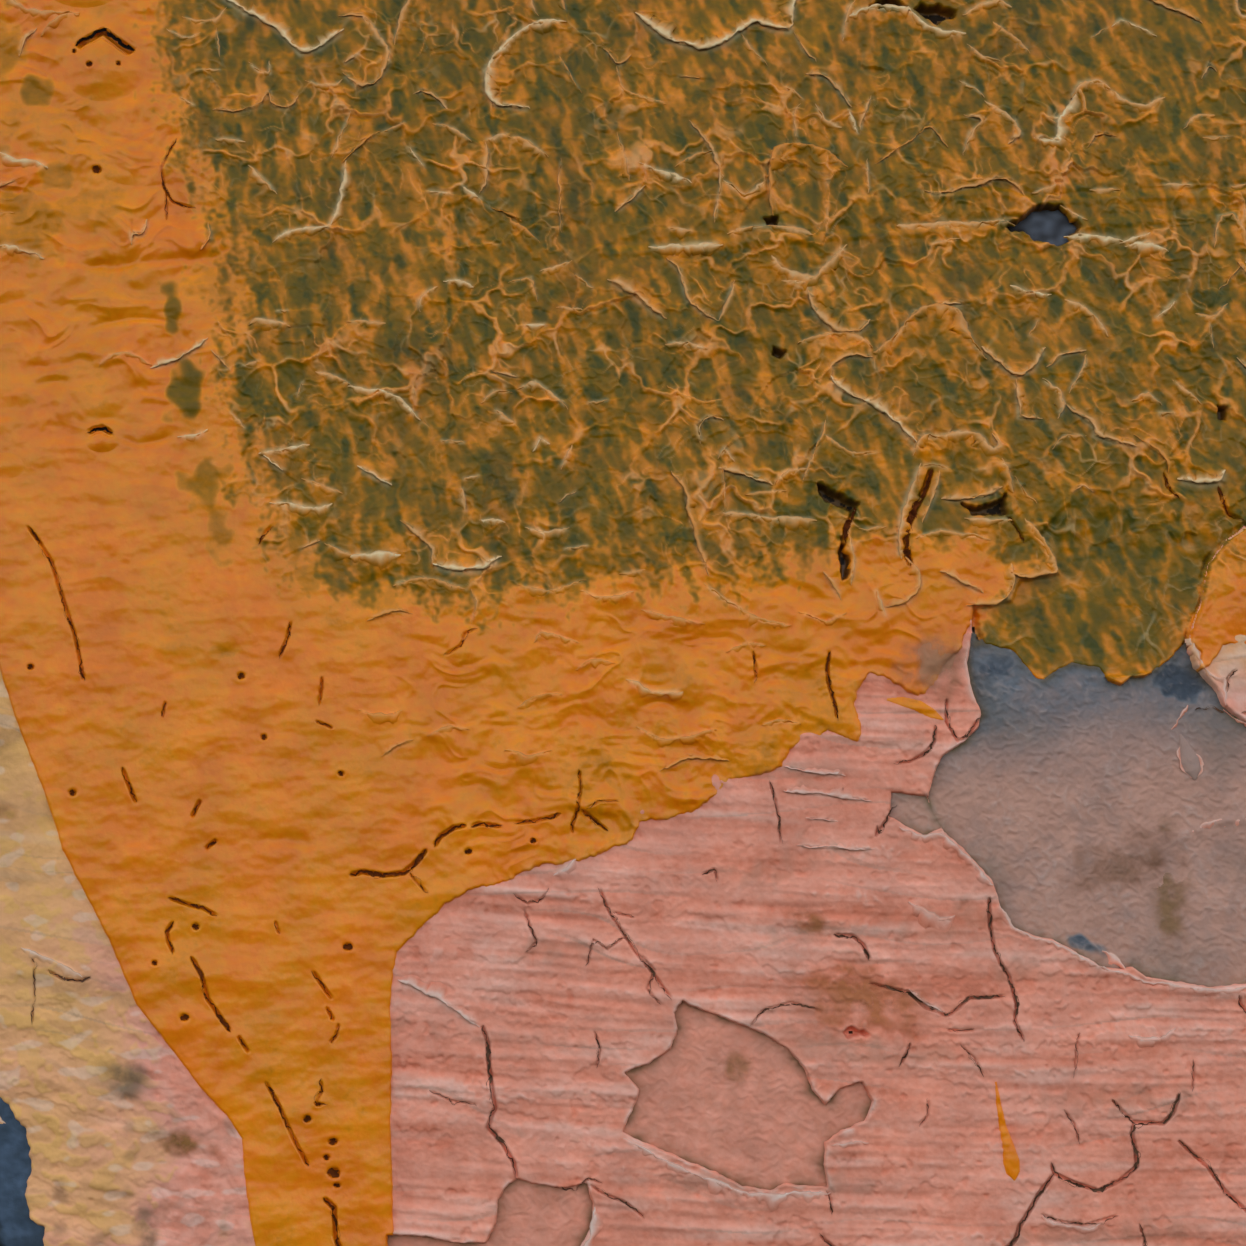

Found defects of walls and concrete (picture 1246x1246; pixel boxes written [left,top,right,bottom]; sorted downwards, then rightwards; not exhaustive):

crack [903,468,933,566]
crack [30,528,85,680]
crack [350,770,616,893]
spalling [889,525,1246,996]
crack [587,895,671,1005]
crack [835,898,1024,1075]
crack [265,1084,309,1165]
crack [324,1198,340,1246]
crack [429,1027,516,1174]
spalling [388,1179,604,1246]
spalling [623,1001,872,1212]
crack [1009,1062,1246,1246]